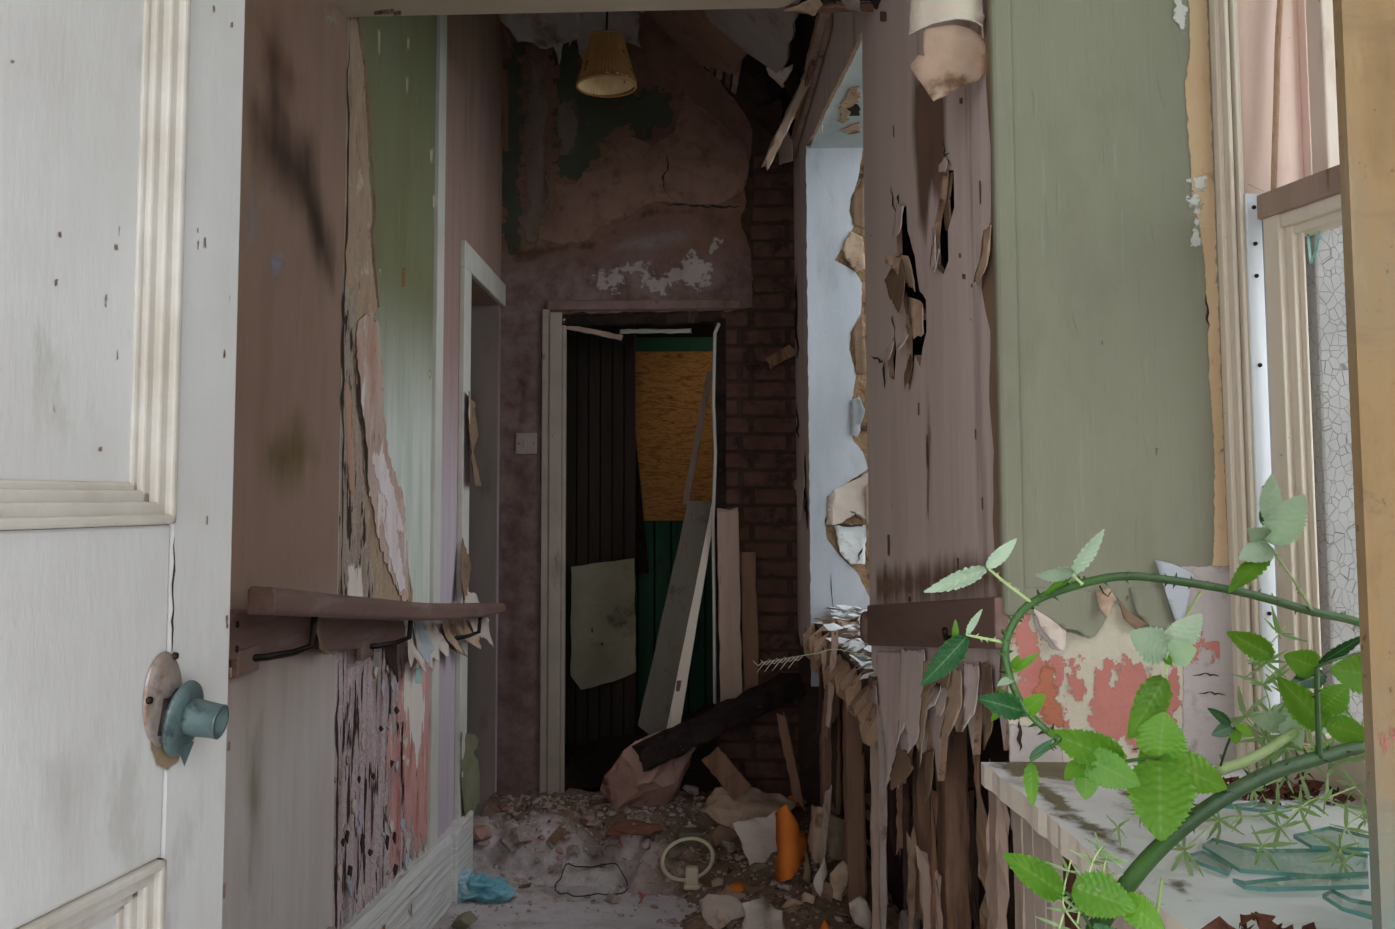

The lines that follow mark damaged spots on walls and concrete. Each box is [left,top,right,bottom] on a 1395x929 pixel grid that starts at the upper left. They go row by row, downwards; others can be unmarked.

flaking render [783,0,887,22]
peeling [1173,0,1188,34]
flaking render [705,60,801,136]
peeling [1186,175,1208,247]
peeling [592,237,724,296]
flaking render [338,9,413,602]
peeling [959,165,1001,597]
spalling [968,778,983,809]
spalling [1007,825,1015,926]
spalling [887,901,923,929]